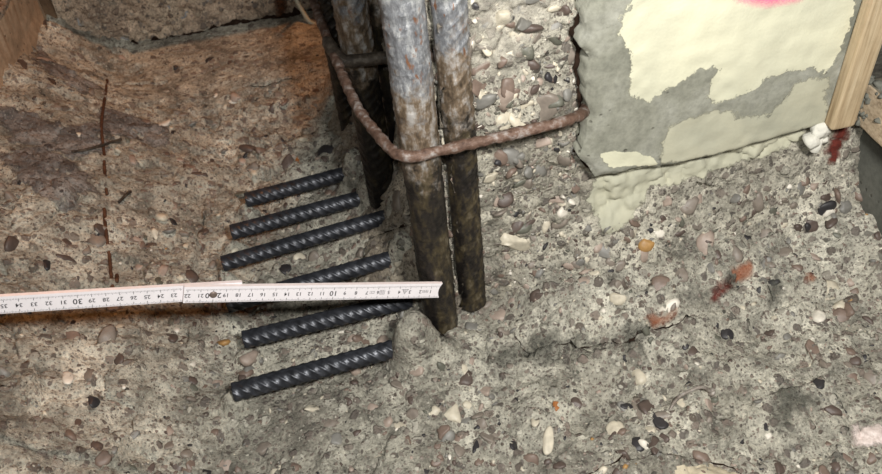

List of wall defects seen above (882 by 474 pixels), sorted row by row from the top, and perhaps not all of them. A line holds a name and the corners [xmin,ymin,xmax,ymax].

crack [131,7,312,45]
spalling [51,0,863,349]
crack [515,315,694,353]